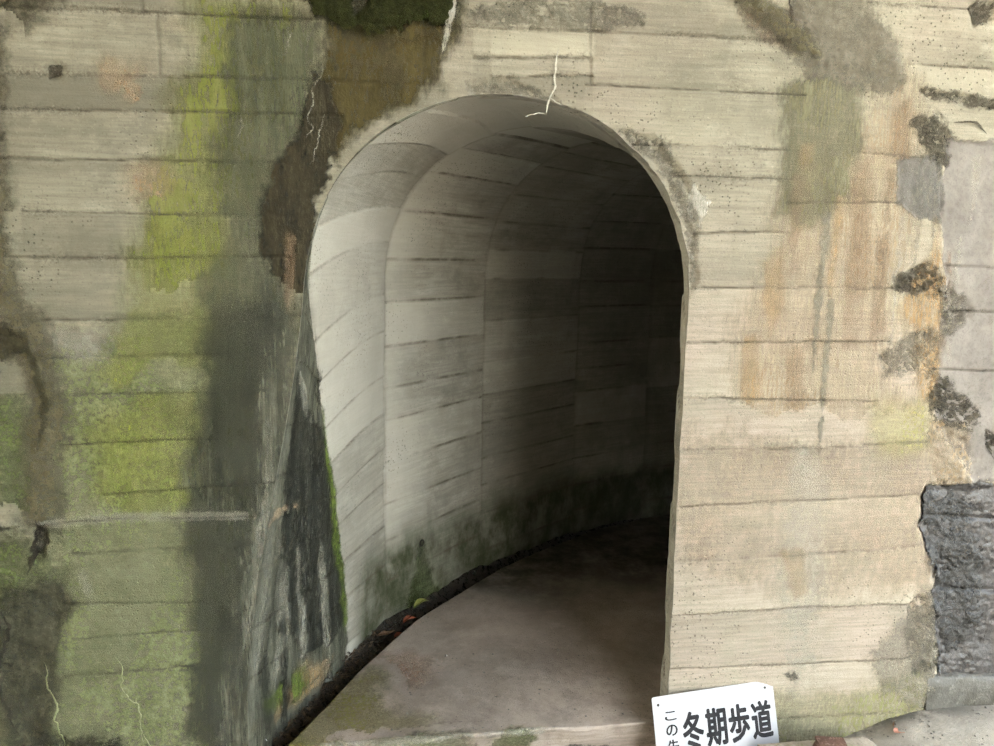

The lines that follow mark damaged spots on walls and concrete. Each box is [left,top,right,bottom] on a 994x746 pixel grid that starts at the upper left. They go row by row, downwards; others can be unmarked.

leakage [0,0,64,31]
crack [526,49,562,117]
leakage [739,0,907,93]
spalling [921,86,994,110]
spalling [969,0,994,26]
rust [740,73,972,484]
leakage [0,132,73,528]
leakage [167,0,458,746]
peeling [871,114,994,711]